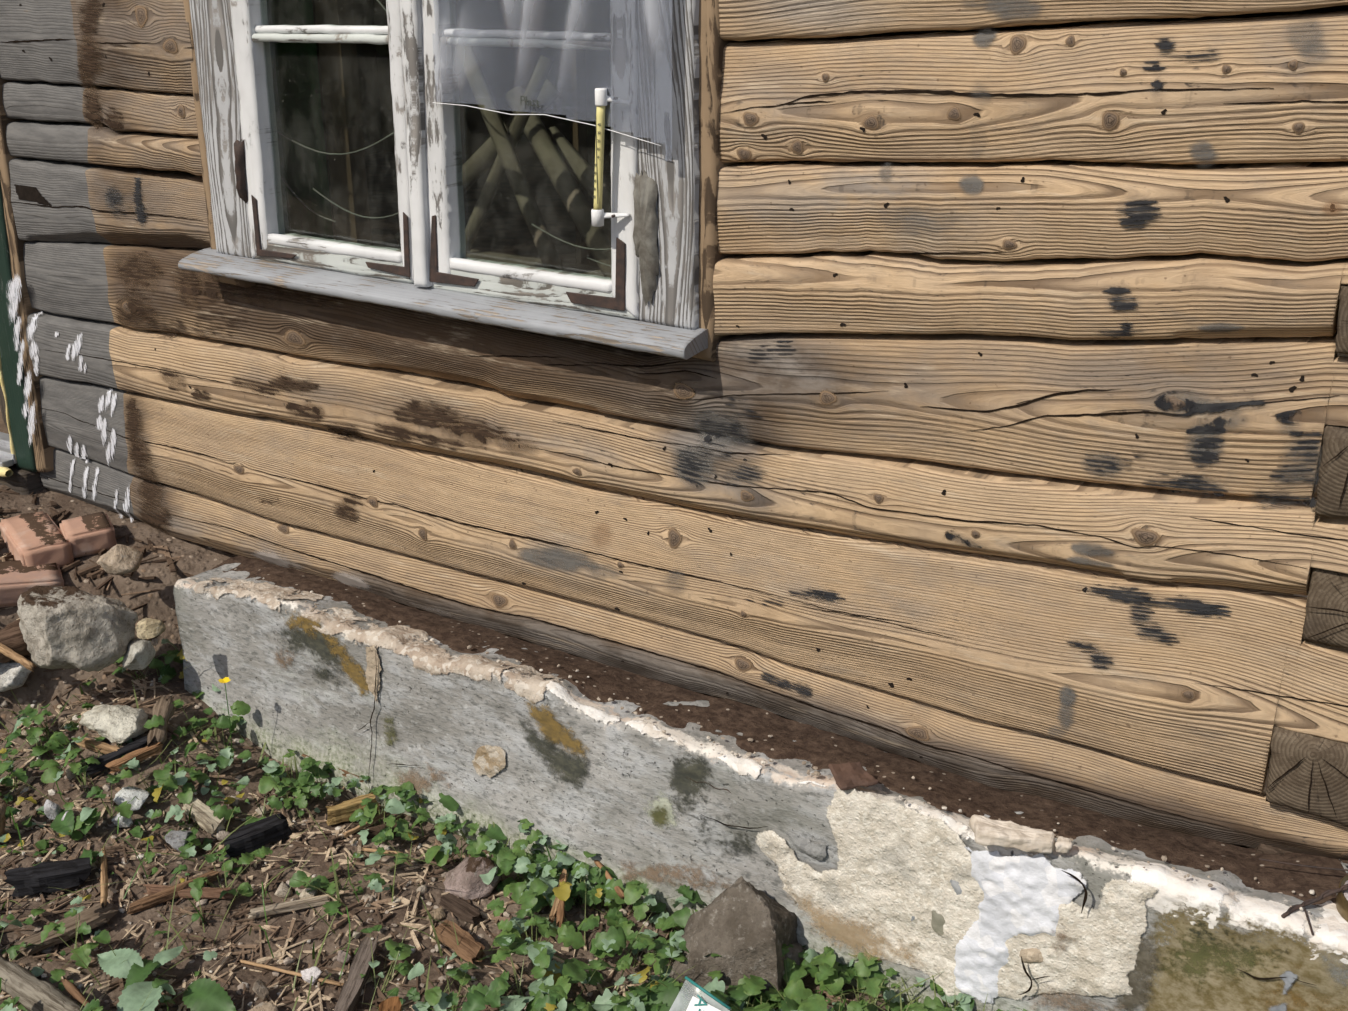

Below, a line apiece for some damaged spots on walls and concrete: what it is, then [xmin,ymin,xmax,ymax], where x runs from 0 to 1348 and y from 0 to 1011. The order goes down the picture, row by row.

crack [463,355,878,400]
crack [921,389,1185,431]
crack [1264,395,1340,403]
leakage [334,573,369,588]
flaking render [365,645,381,702]
crack [155,511,1292,846]
leakage [188,577,762,856]
flaking render [756,788,1158,1004]
leakage [1114,861,1348,1011]